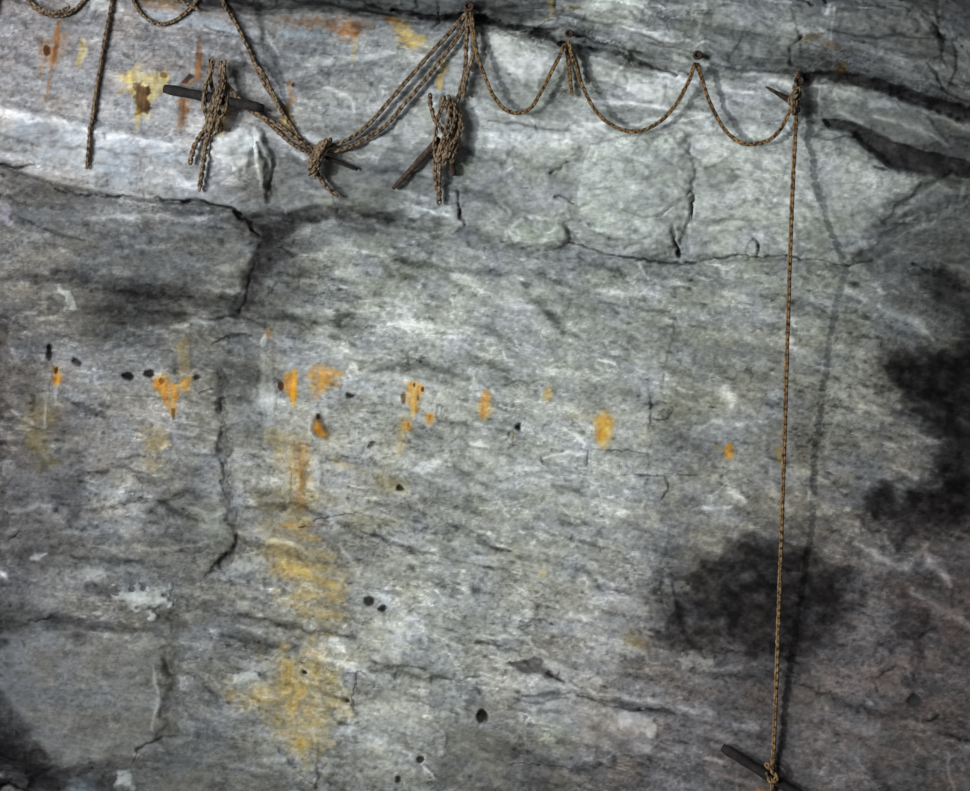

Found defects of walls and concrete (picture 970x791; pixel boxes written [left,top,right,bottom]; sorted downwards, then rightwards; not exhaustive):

corrosion [33,19,71,104]
corrosion [114,38,234,135]
crack [344,0,680,79]
crack [0,162,36,177]
corrosion [132,337,196,477]
crack [54,188,294,580]
leakage [639,261,970,713]
leakage [82,582,146,600]
corrosion [217,360,438,778]
leakage [0,611,168,679]
crack [131,604,190,764]
leakage [0,710,139,791]